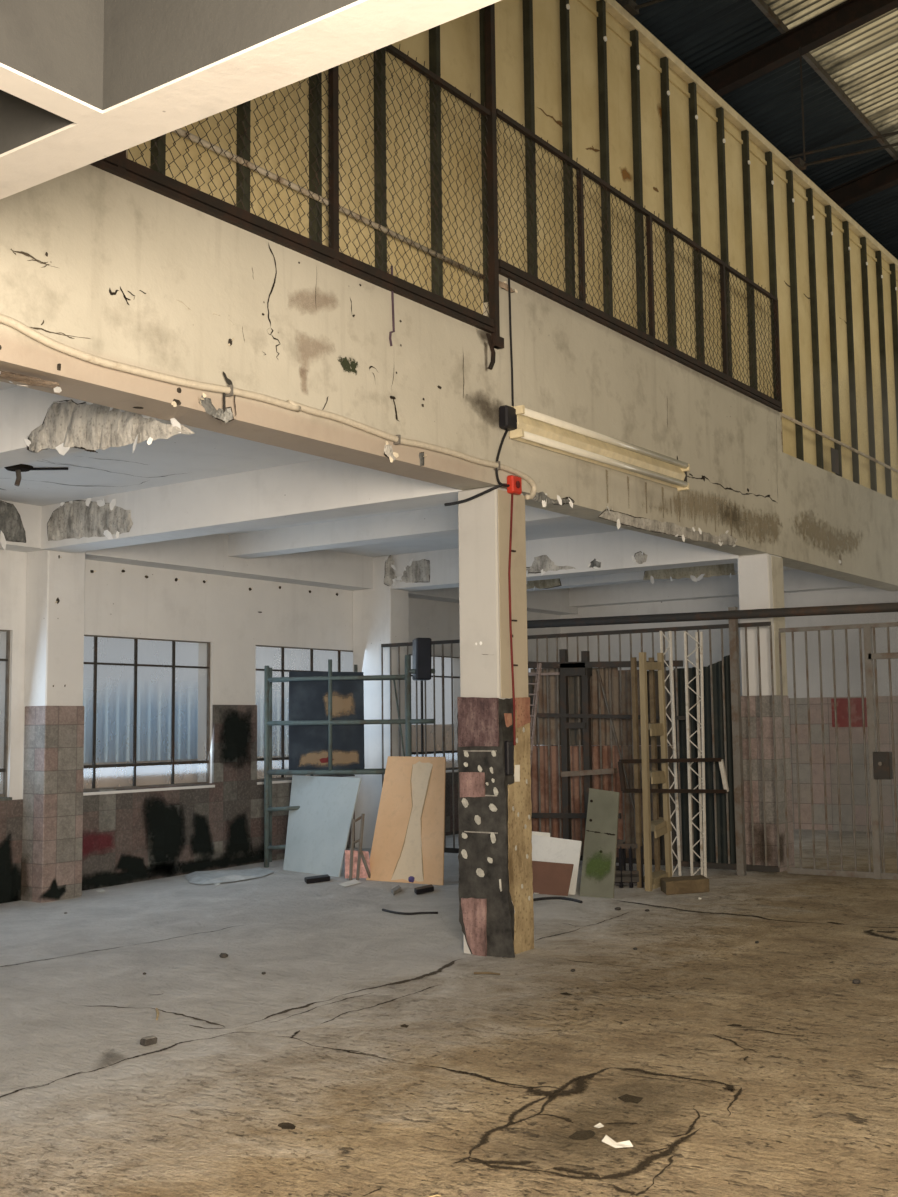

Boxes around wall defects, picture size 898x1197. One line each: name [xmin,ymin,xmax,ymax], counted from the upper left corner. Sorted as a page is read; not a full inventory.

crack [213,242,280,359]
spalling [0,363,194,455]
spalling [198,372,236,424]
spalling [0,500,26,550]
spalling [47,498,133,558]
crack [0,959,800,1196]